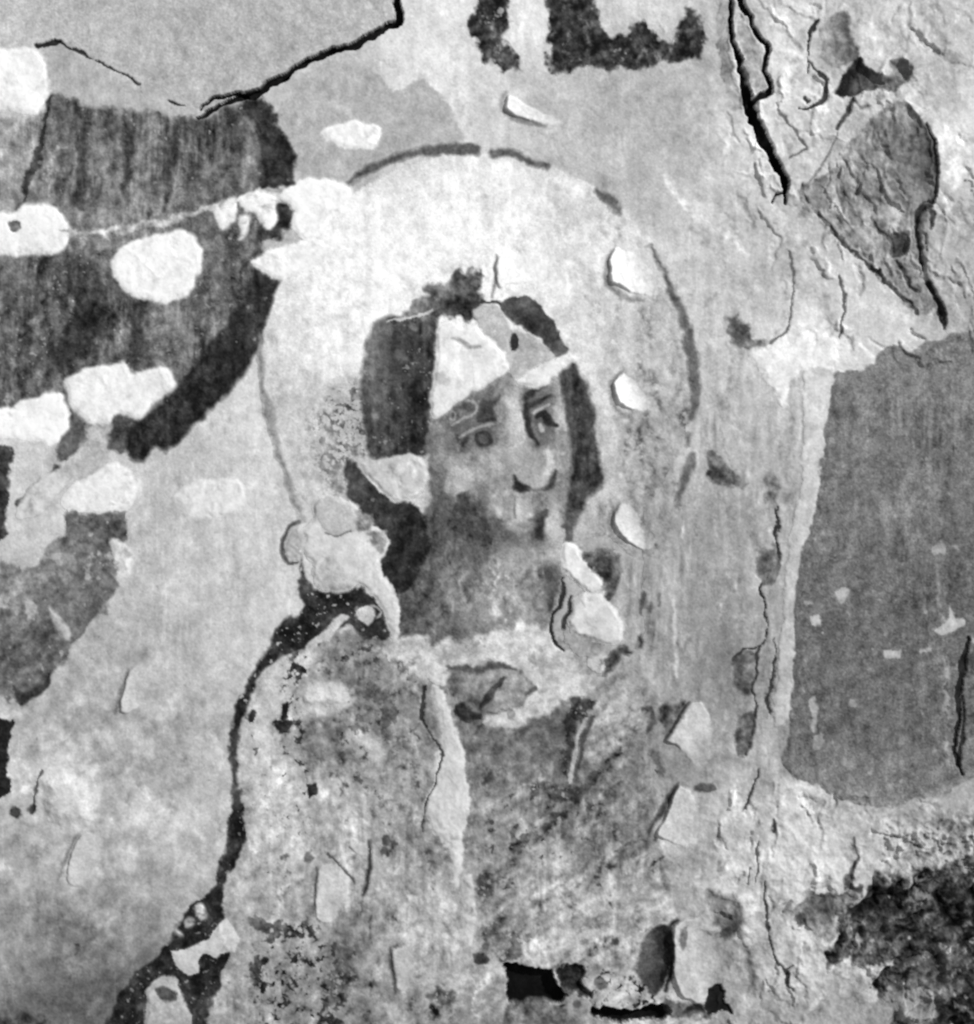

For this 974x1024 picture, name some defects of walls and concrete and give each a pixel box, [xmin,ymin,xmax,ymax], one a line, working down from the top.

crack [34,38,141,86]
crack [167,0,403,119]
crack [728,0,829,204]
flaking render [0,202,71,258]
flaking render [110,228,203,305]
flaking render [0,361,177,520]
flaking render [280,494,401,643]
crack [773,506,781,551]
crack [734,582,777,716]
crack [952,636,971,776]
flaking render [503,907,733,1023]
spalling [793,810,974,1024]